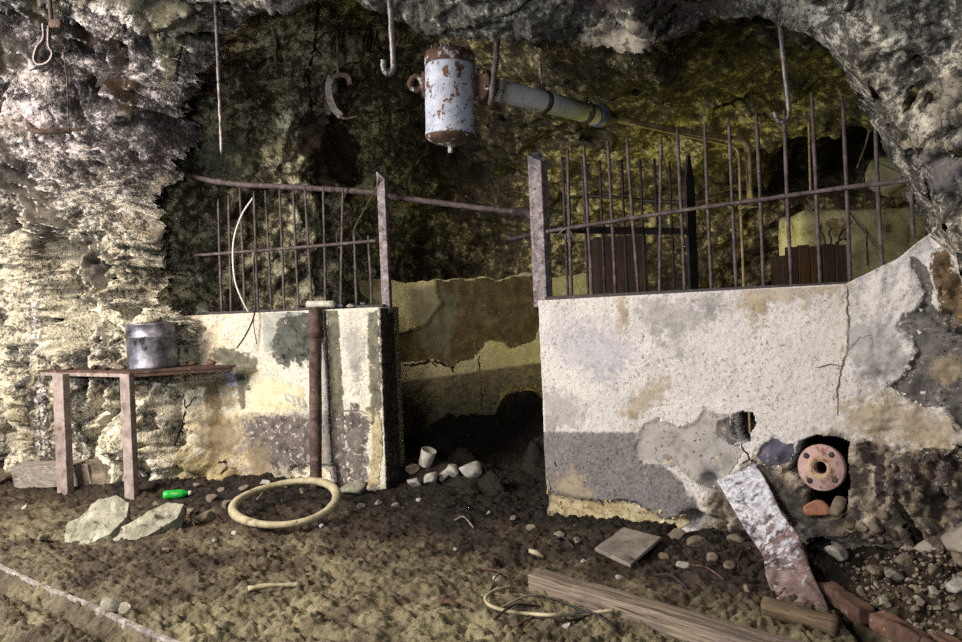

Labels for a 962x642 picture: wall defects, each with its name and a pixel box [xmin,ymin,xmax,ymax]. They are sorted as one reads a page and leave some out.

leakage [209,311,310,475]
peeling [399,275,539,367]
crack [815,285,870,416]
peeling [890,256,962,429]
flaking render [365,407,383,487]
peeling [635,407,743,492]
flaking render [755,438,795,468]
flaking render [547,473,689,529]
flaking render [884,447,962,554]